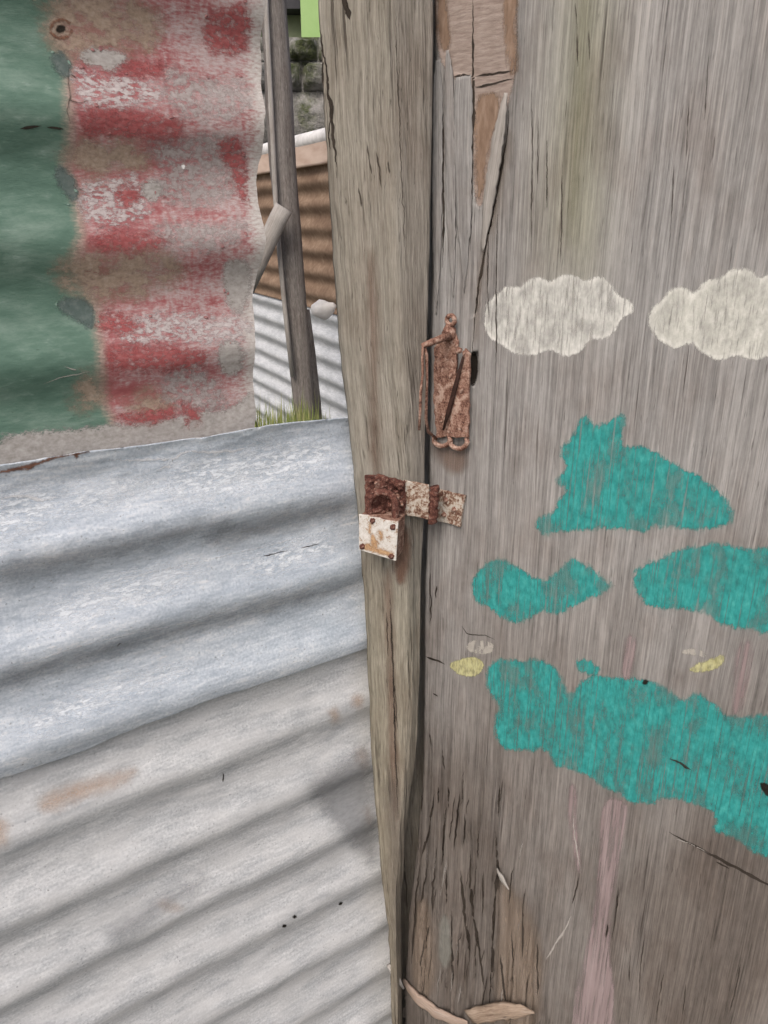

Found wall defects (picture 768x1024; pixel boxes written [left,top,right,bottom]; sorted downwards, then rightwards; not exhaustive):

peeling [201,0,252,56]
peeling [51,46,252,209]
crack [439,114,447,267]
crack [454,10,562,366]
peeling [55,298,228,426]
corrosion [367,476,405,515]
corrosion [395,529,409,582]